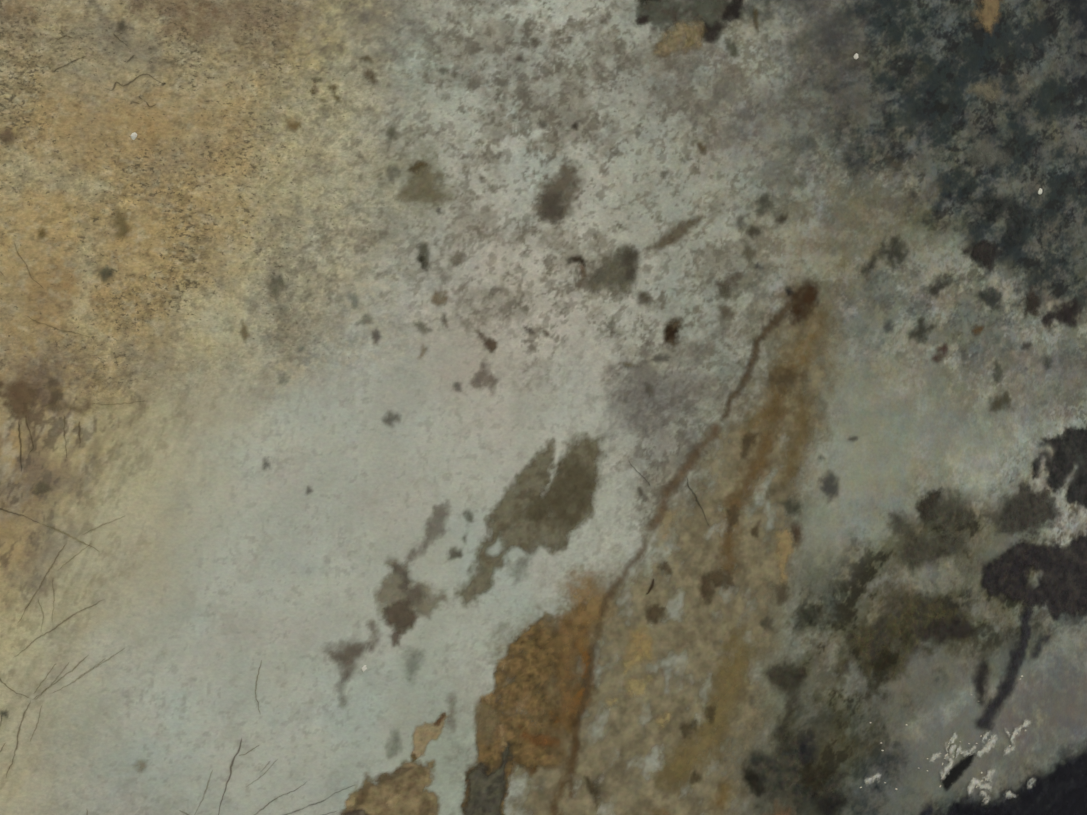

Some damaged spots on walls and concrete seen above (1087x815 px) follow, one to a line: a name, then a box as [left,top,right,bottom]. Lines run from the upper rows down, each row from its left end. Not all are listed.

crack [1,509,98,620]
leakage [377,505,448,645]
leakage [459,438,601,604]
rust [513,284,834,815]
mould [974,427,1087,729]
crack [218,740,256,815]
leakage [331,644,372,701]
peeling [341,698,453,815]
peeling [462,614,563,815]
leakage [947,754,1087,815]